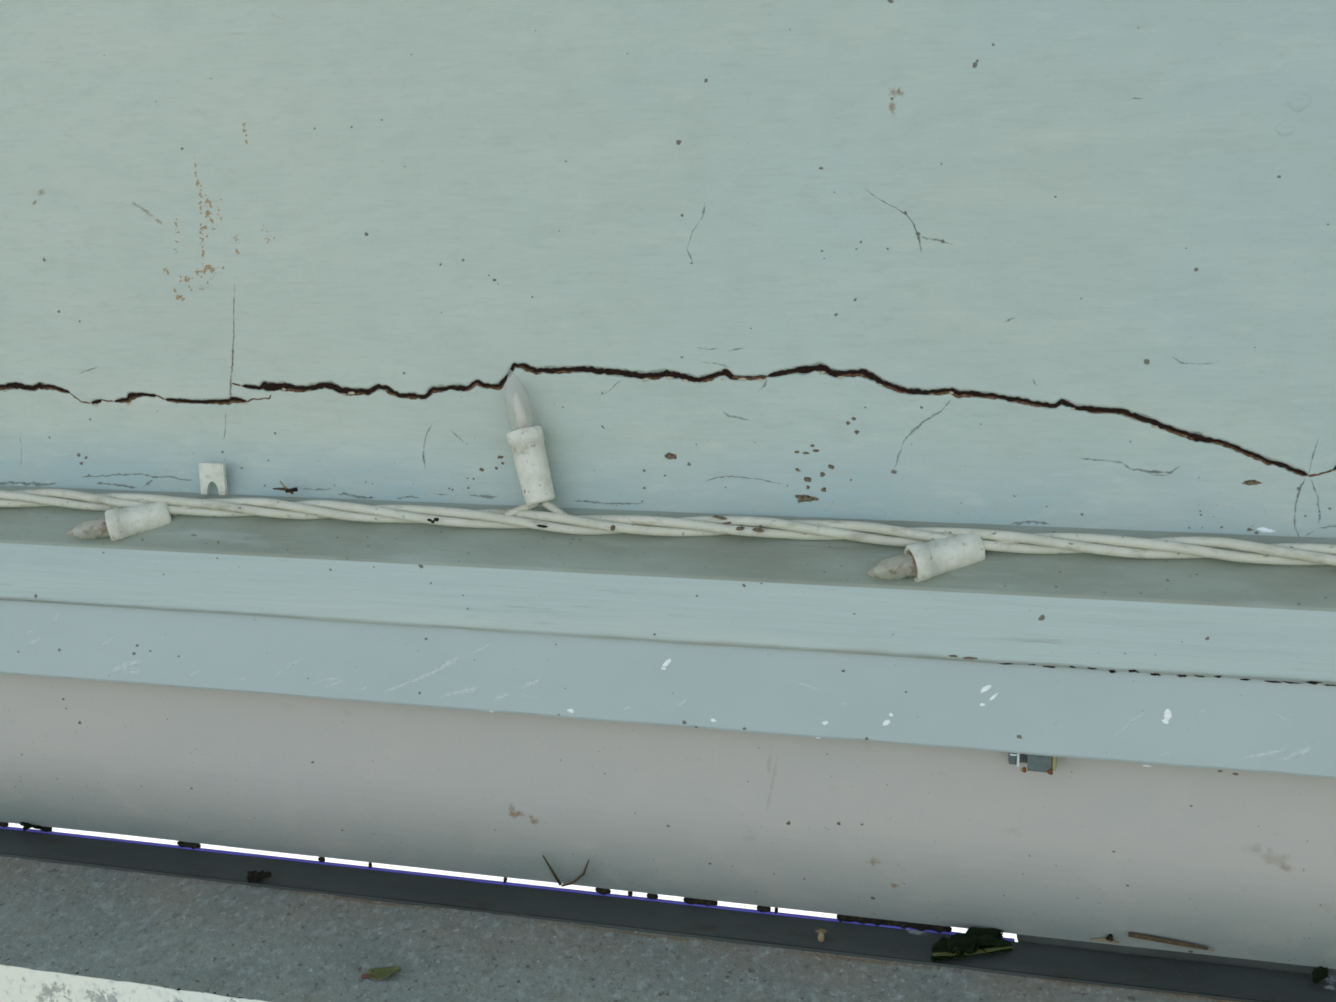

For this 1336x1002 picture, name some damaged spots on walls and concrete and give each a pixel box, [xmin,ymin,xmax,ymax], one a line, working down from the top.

crack [0,285,1336,536]